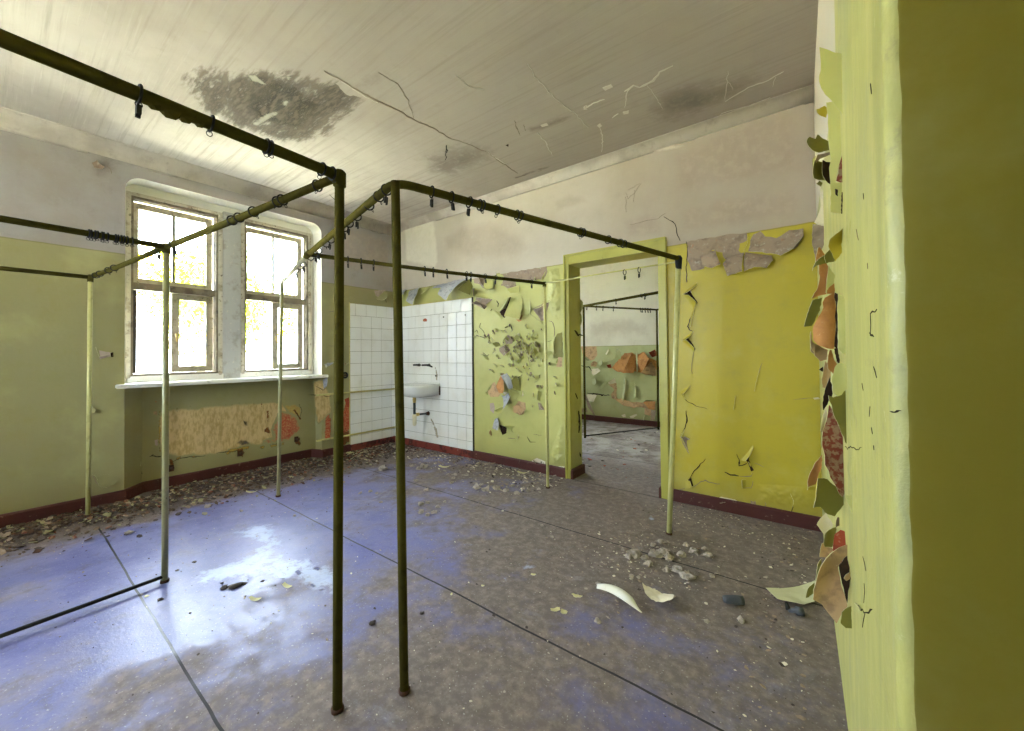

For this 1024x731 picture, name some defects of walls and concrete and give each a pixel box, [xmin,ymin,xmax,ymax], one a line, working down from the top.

damp [168,60,371,146]
crack [324,71,552,173]
crack [583,65,673,152]
flaking render [156,401,289,458]
flaking render [313,362,348,424]
peeling [402,266,563,442]
peeling [580,299,657,420]
flaking render [682,47,852,628]
crack [679,454,766,506]